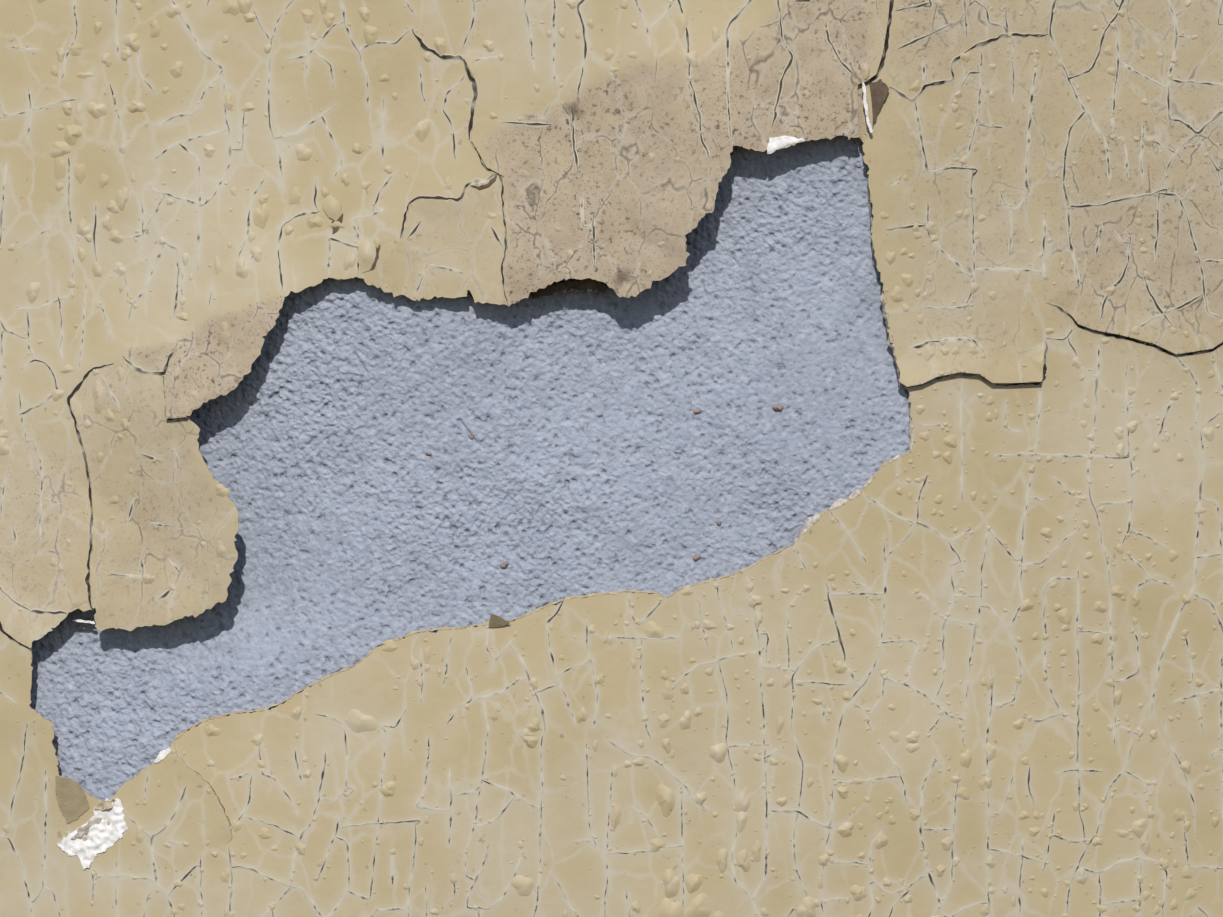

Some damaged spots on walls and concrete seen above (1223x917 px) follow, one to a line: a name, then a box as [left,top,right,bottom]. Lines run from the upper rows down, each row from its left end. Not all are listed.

peeling [0,494,92,648]
crack [0,0,596,650]
crack [91,594,713,917]
peeling [30,0,1046,877]
crack [635,0,711,159]
crack [672,0,1223,917]